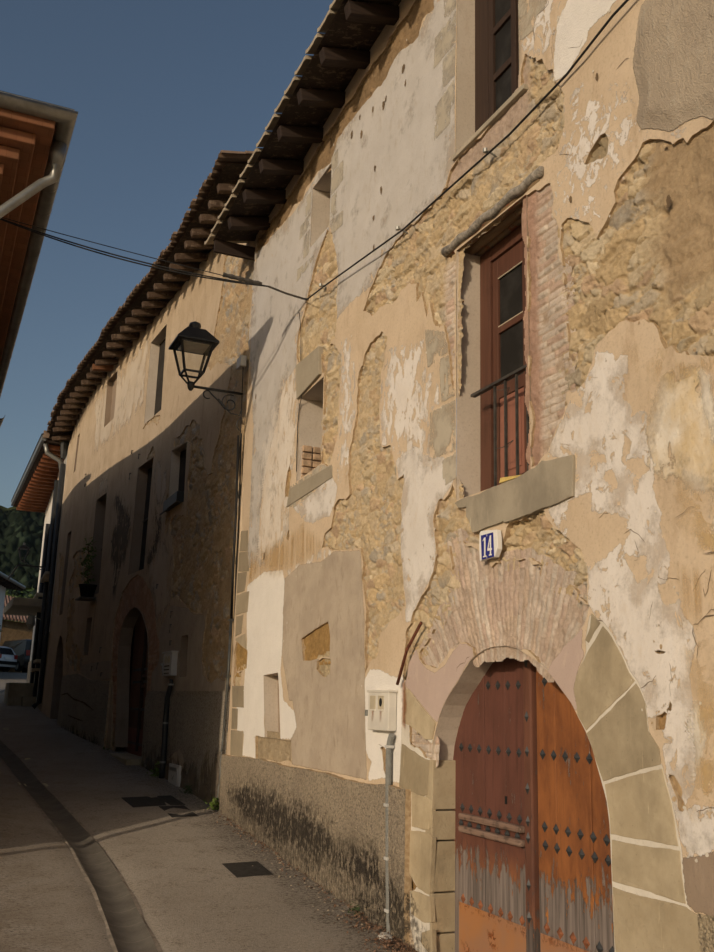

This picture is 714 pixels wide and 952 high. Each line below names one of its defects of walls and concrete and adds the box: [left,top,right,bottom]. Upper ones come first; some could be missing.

spalling [111,575,159,752]
spalling [170,0,714,862]